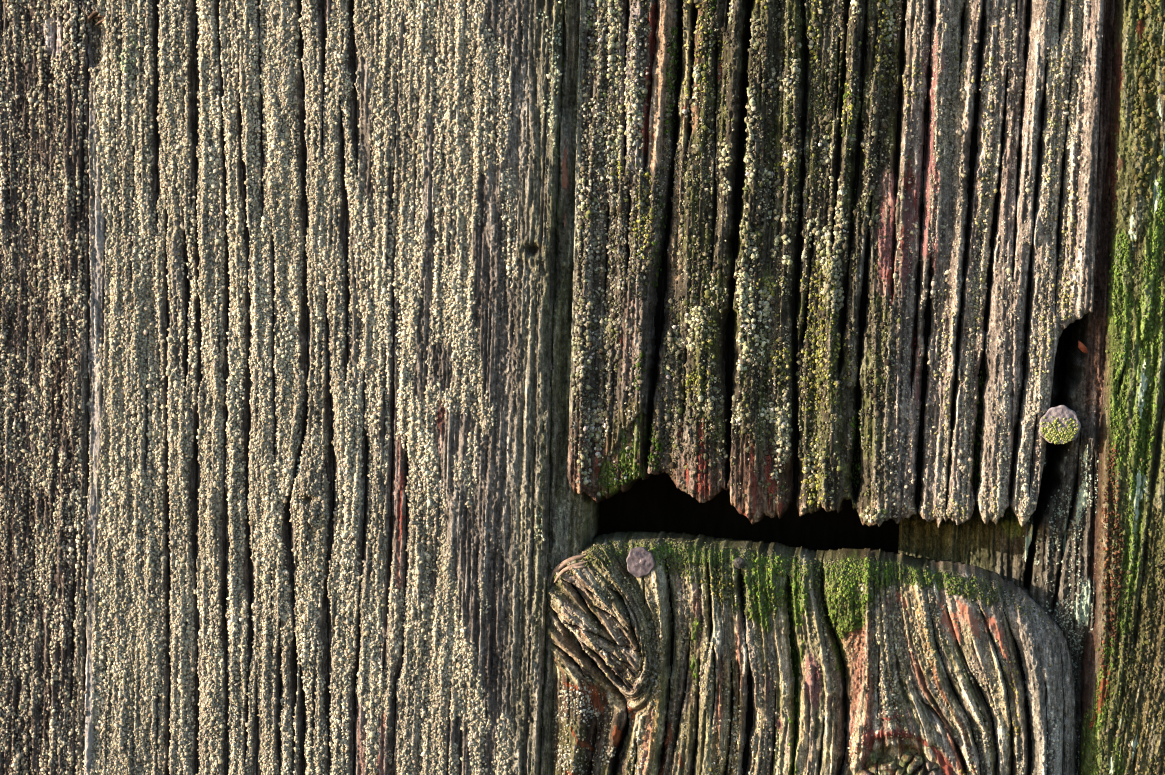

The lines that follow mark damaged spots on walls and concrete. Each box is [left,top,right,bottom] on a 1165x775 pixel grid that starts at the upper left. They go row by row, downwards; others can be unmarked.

crack [155,0,408,775]
crack [526,0,847,775]
crack [874,640,882,720]
crack [793,0,1095,615]
crack [921,604,1083,775]